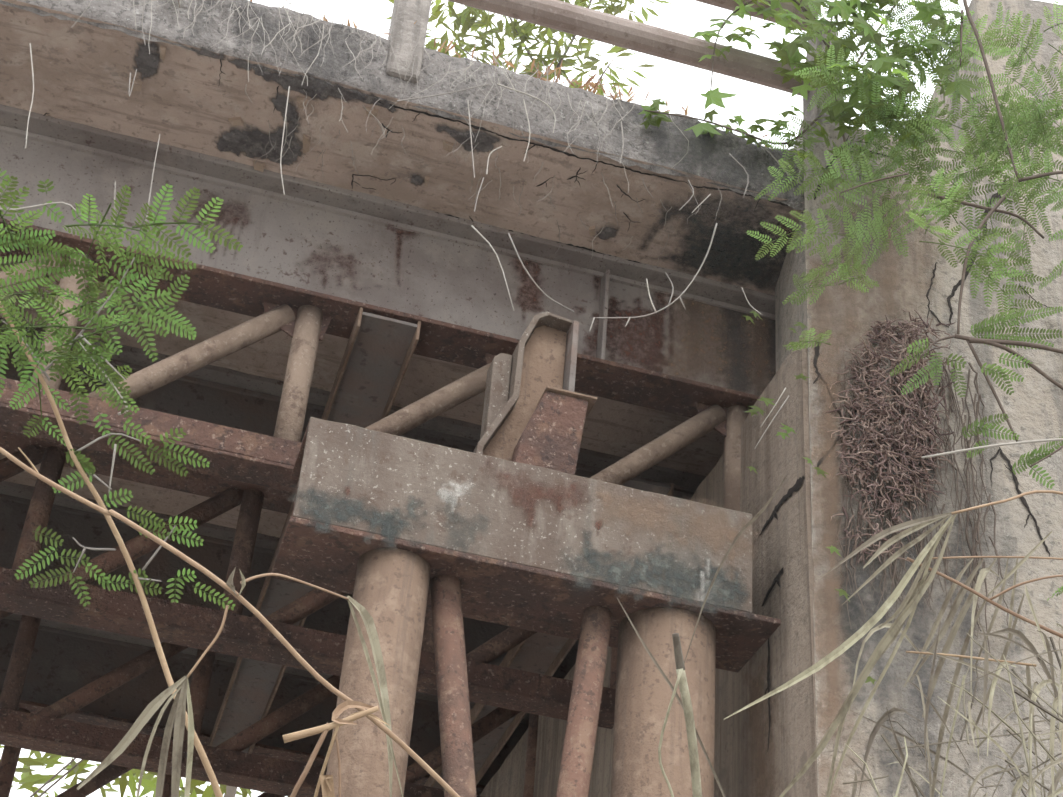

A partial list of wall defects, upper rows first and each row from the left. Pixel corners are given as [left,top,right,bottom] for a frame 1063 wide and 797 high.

crack [351,174,396,190]
crack [377,101,790,230]
damp [635,110,799,290]
crack [814,135,890,200]
crack [558,242,664,269]
crack [926,177,1010,328]
corrosion [576,293,674,373]
crack [759,331,859,536]
crack [762,568,783,606]